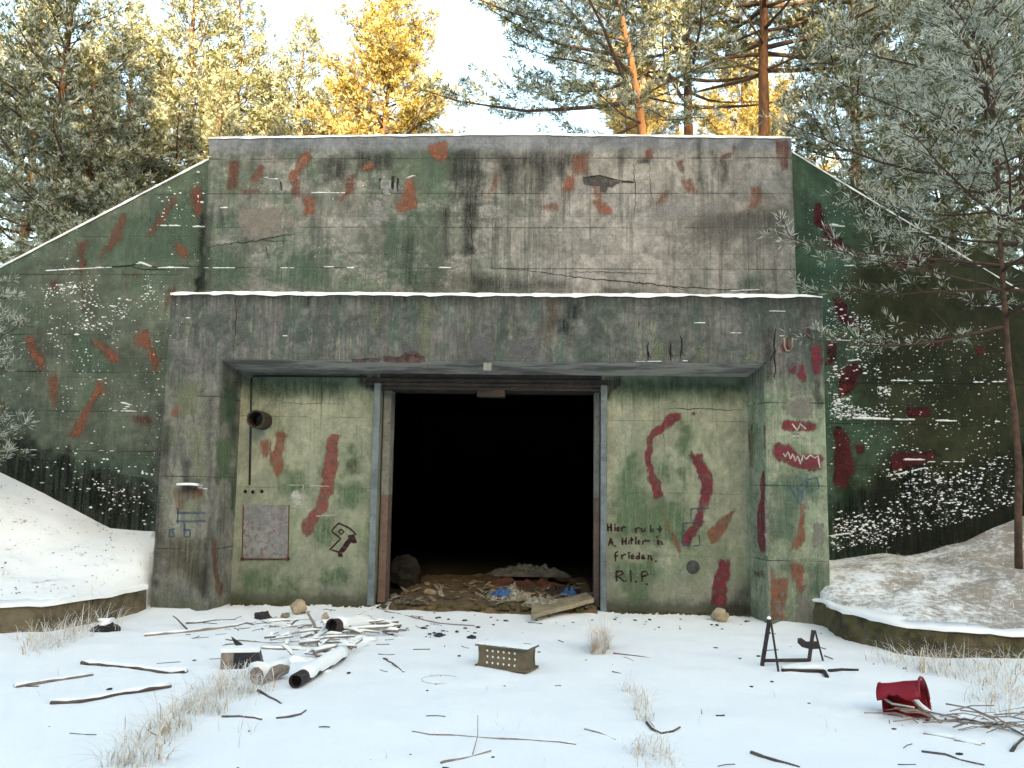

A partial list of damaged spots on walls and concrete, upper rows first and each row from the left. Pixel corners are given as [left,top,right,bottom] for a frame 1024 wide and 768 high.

crack [57,232,298,271]
leakage [444,151,480,252]
leakage [502,154,578,193]
crack [469,149,782,293]